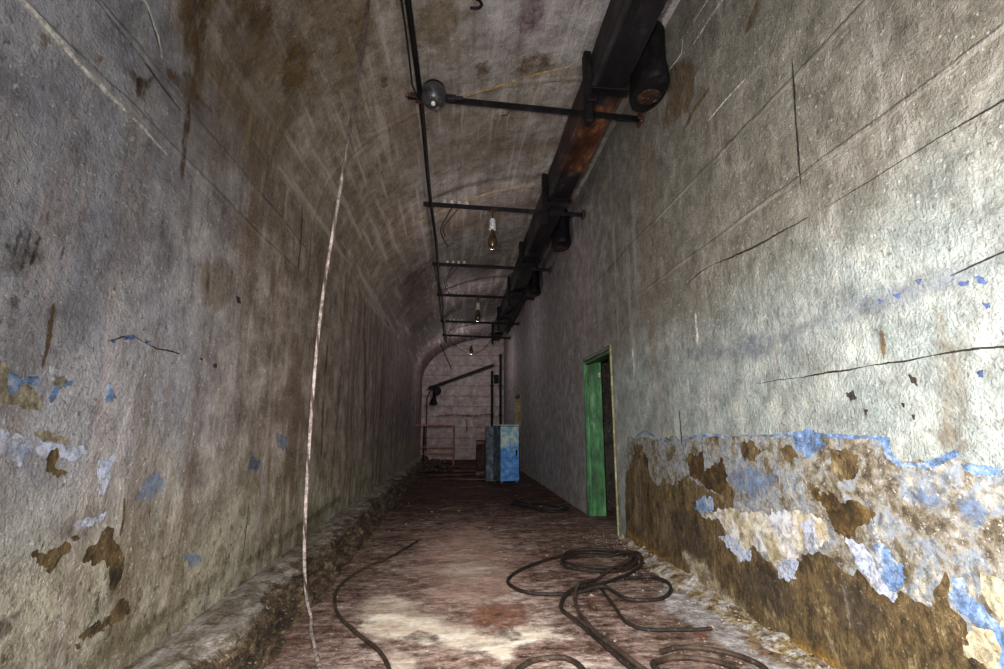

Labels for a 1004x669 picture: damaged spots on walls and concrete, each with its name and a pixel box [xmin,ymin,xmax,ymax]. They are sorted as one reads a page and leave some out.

damp [181,0,372,171]
crack [792,60,801,186]
crack [685,99,1004,286]
peeling [0,356,75,410]
crack [758,346,1004,384]
peeling [0,428,88,478]
peeling [97,454,116,498]
flaking render [31,472,163,650]
flaking render [625,427,1004,669]